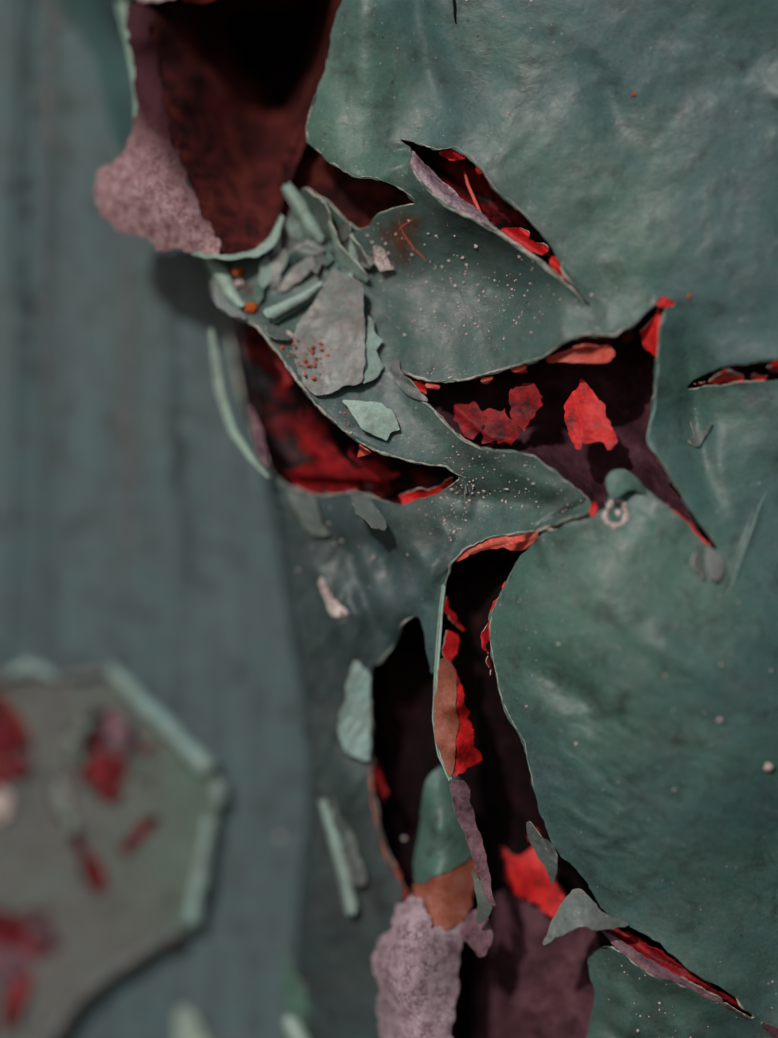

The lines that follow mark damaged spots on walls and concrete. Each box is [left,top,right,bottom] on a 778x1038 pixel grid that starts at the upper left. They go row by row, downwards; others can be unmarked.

spalling [152,0,342,292]
peeling [305,190,394,282]
spalling [385,182,414,205]
spalling [401,140,555,270]
spalling [208,271,458,505]
spalling [687,360,778,389]
spalling [338,305,725,1038]
peeling [0,695,35,821]
peeling [50,707,166,896]
peeling [0,908,65,1033]
peeling [174,1006,207,1038]